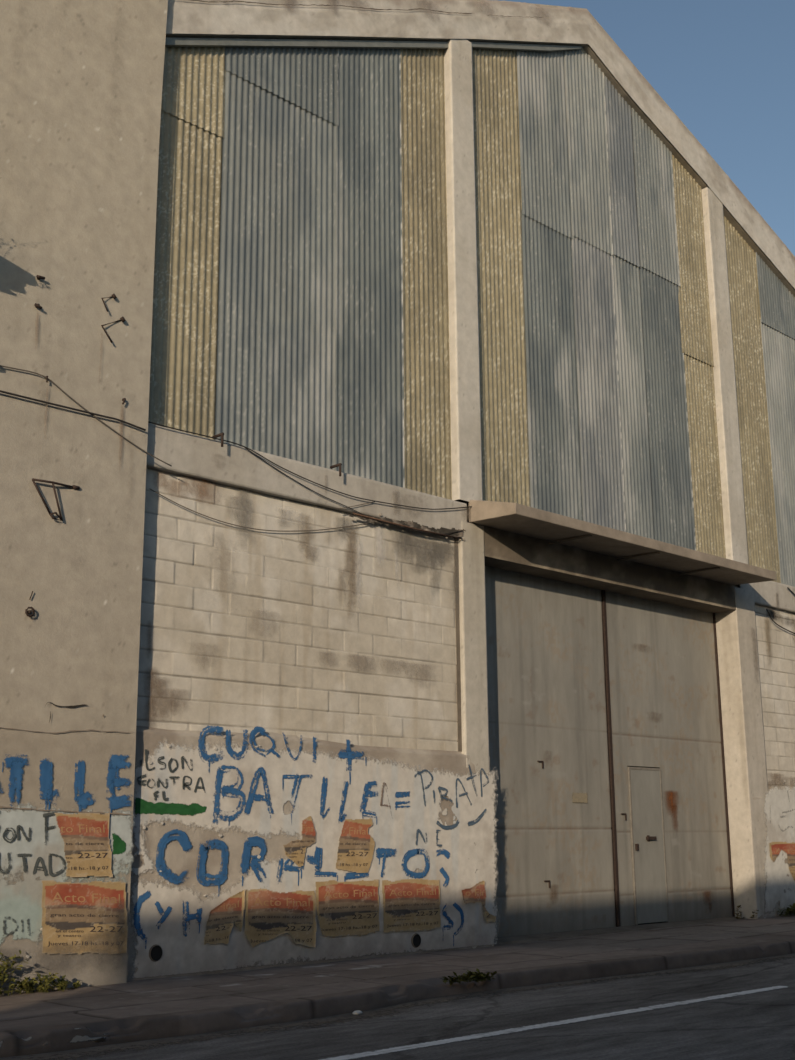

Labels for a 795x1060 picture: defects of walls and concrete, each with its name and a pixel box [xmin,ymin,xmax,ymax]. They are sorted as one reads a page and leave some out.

damp [342,523,360,592]
damp [398,533,459,602]
damp [766,594,779,651]
corrosion [667,791,676,817]